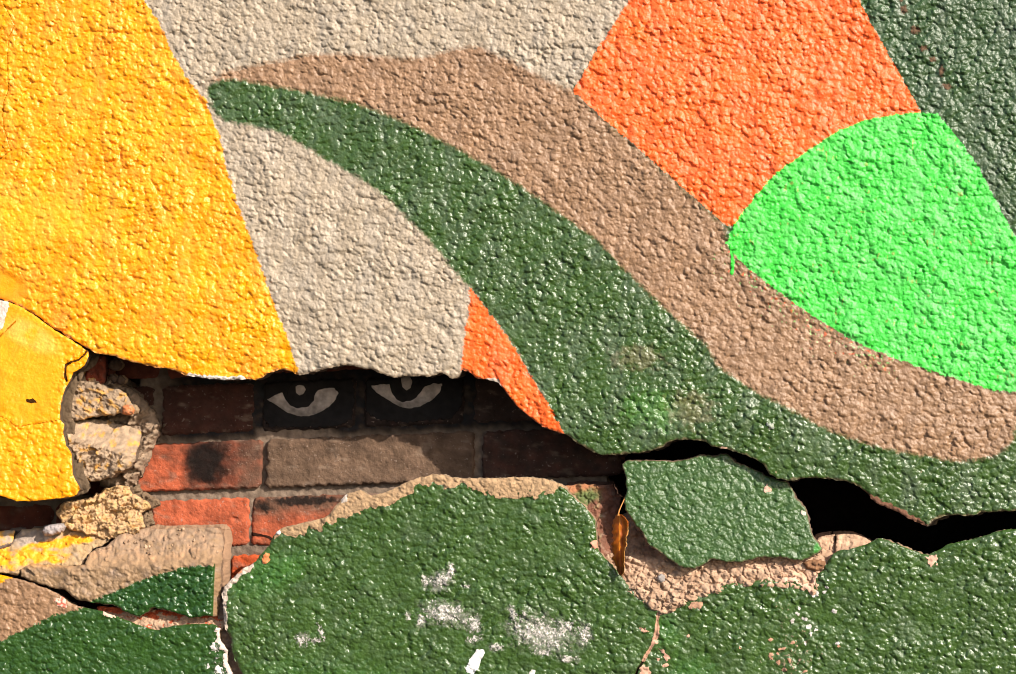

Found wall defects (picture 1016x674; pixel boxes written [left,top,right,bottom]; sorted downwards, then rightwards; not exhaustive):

crack [0,299,90,382]
spalling [85,355,116,384]
spalling [97,553,270,631]
damp [422,564,454,587]
damp [406,599,482,643]
damp [507,608,591,662]
spalling [274,474,829,674]
crack [635,612,660,674]